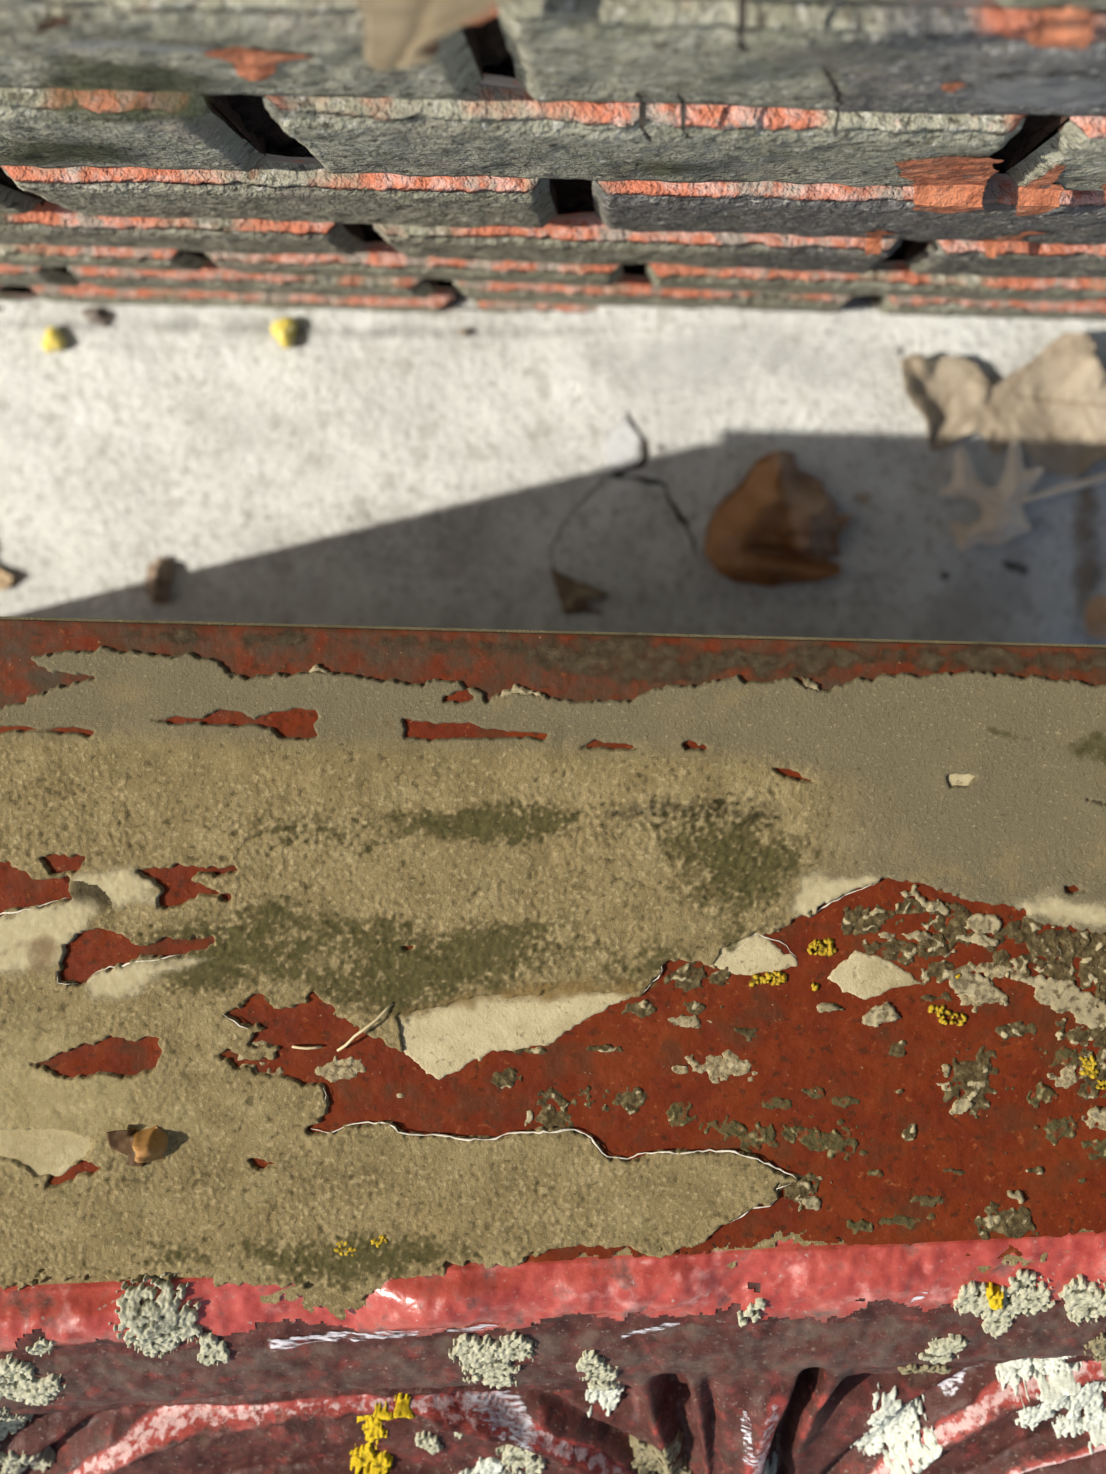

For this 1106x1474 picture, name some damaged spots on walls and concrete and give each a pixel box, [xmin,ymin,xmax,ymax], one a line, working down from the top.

spalling [1027,7,1094,49]
spalling [204,48,314,81]
spalling [893,157,1004,214]
spalling [968,165,1065,258]
peeling [0,620,1106,708]
peeling [0,726,94,736]
peeling [163,708,318,739]
peeling [404,719,547,740]
flaking render [0,854,237,999]
peeling [38,1036,162,1078]
peeling [221,873,1106,1259]
peeling [508,1245,647,1268]